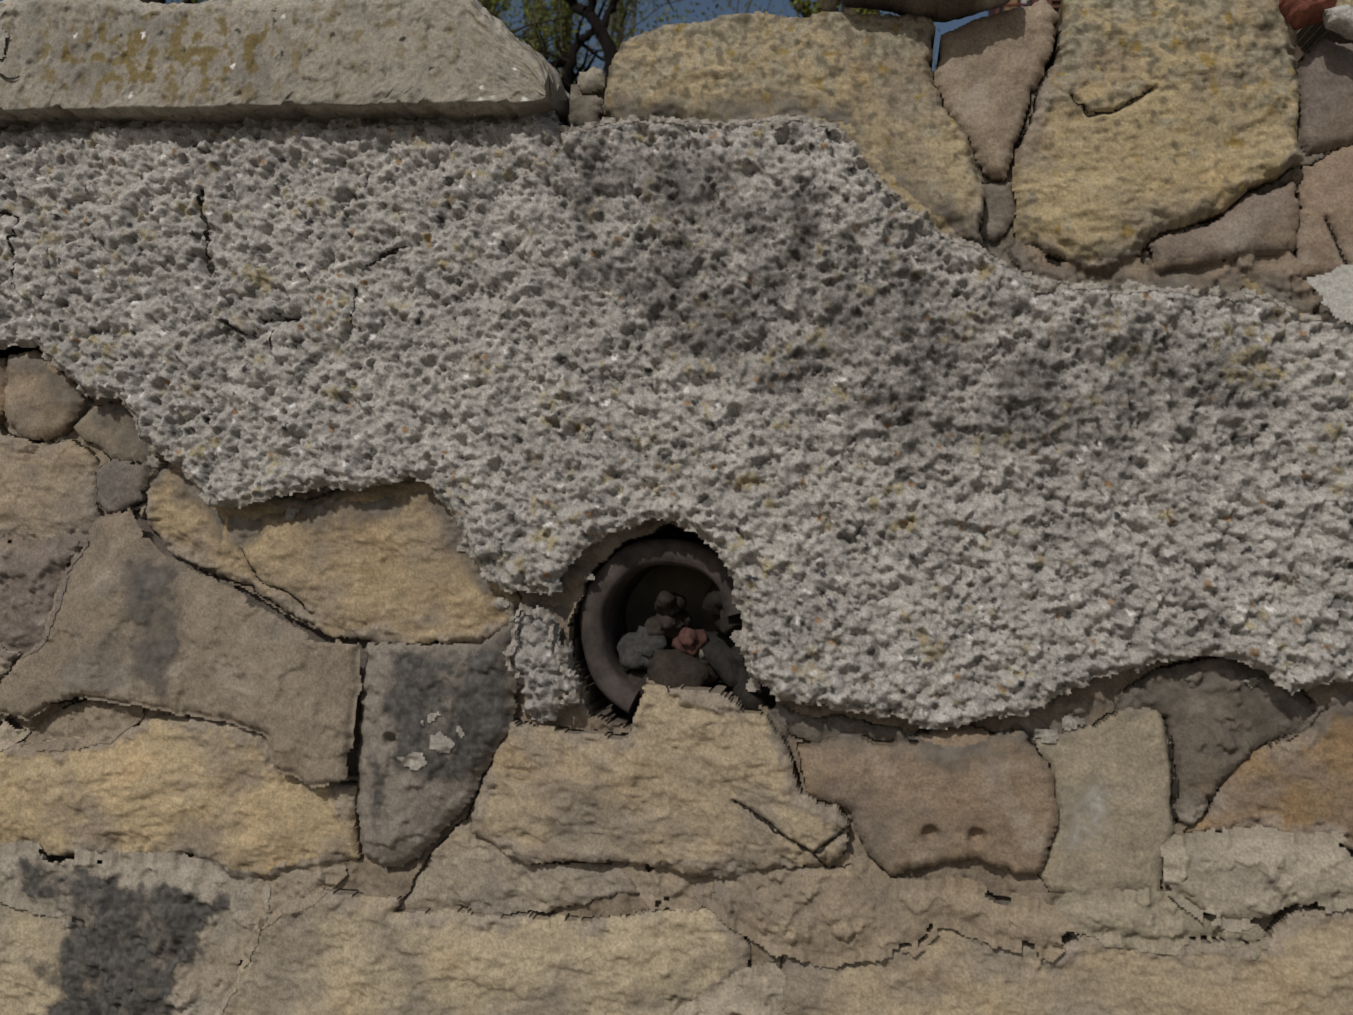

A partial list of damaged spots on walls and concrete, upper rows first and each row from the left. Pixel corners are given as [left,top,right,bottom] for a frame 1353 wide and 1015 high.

crack [0,209,21,289]
crack [196,189,214,275]
spalling [555,96,1350,323]
crack [215,317,299,350]
spalling [0,336,1353,770]
damp [16,855,229,1015]